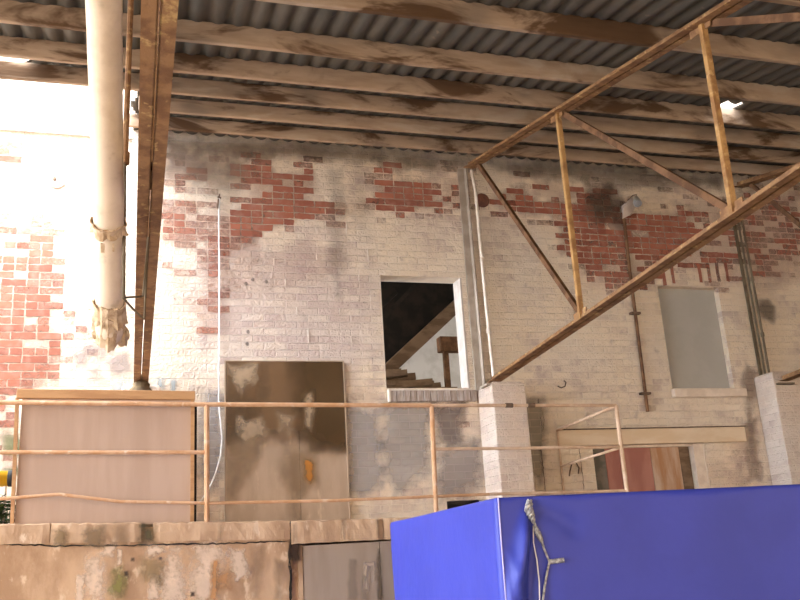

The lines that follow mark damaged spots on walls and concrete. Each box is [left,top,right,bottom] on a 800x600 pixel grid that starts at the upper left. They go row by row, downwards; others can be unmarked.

peeling [161,153,346,277]
damp [167,141,346,158]
peeling [366,162,714,289]
damp [509,166,671,223]
peeling [640,187,800,290]
peeling [0,217,87,427]
peeling [199,291,230,313]
crack [2,521,292,600]